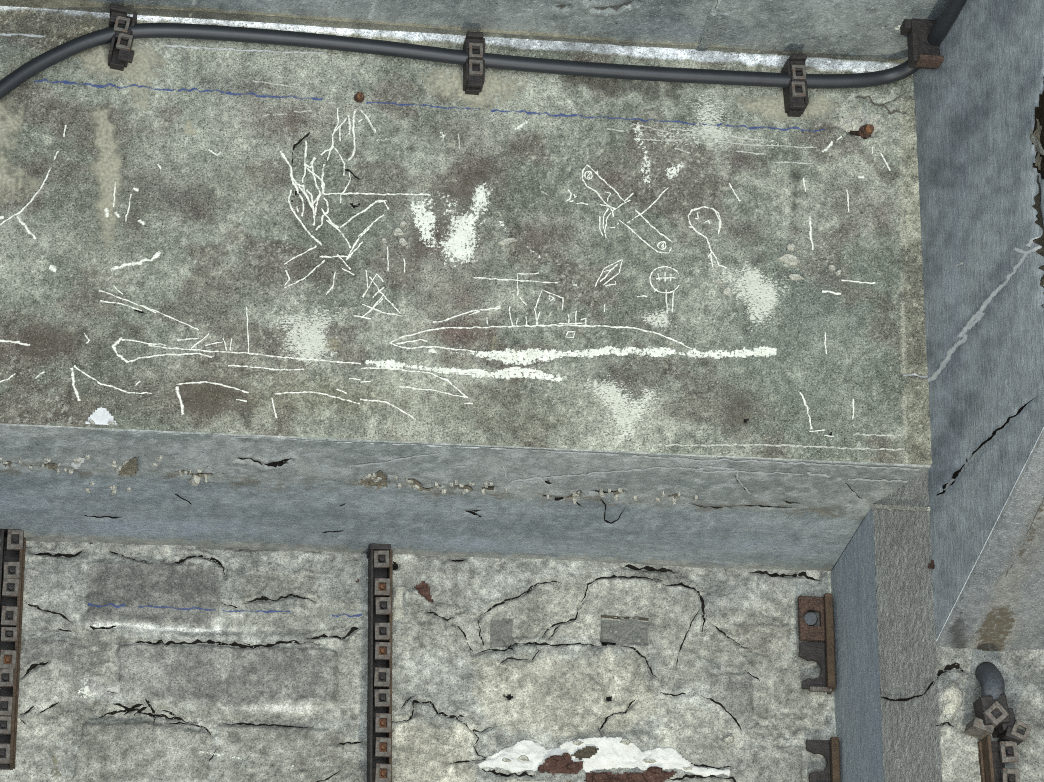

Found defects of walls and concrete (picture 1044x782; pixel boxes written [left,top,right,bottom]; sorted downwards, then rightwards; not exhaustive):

crack [1032,175,1044,308]
spalling [0,455,90,474]
spalling [109,458,138,495]
spalling [179,470,213,486]
spalling [358,471,508,494]
spalling [542,490,582,504]
crack [24,601,361,649]
crack [428,564,760,729]
crack [95,691,307,761]
crack [392,697,535,777]
flaking render [538,746,677,782]
crack [667,763,736,782]